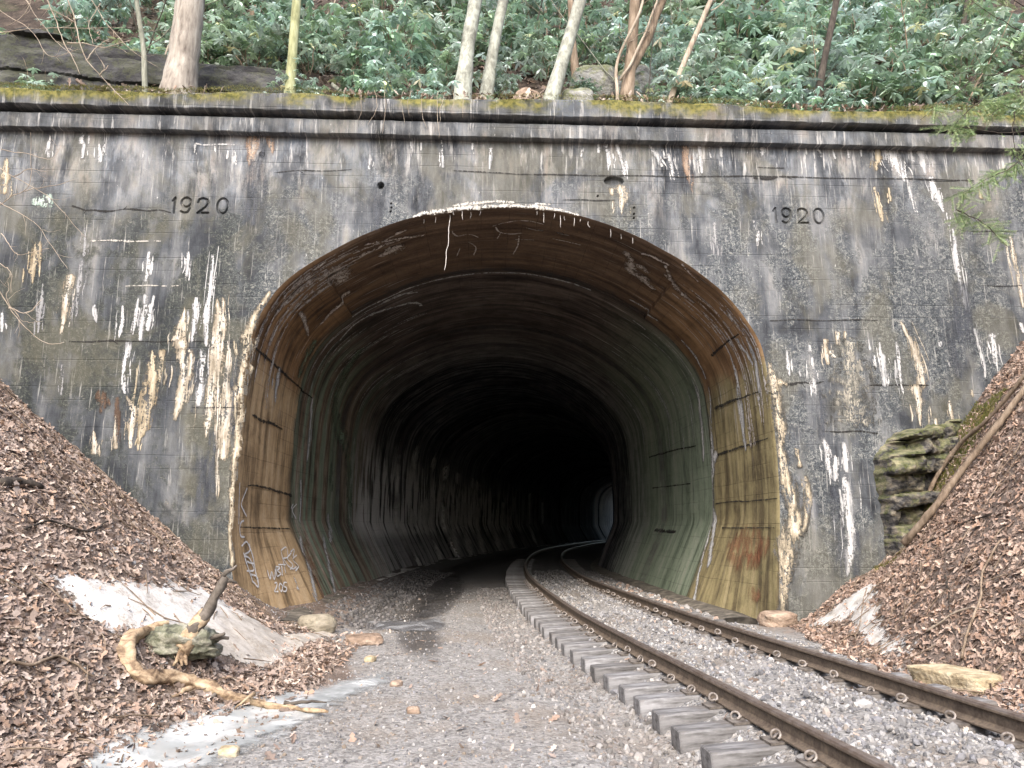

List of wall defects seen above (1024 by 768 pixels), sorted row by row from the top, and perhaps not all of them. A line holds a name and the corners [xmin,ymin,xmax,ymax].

damp [0,158,12,197]
damp [79,132,105,163]
damp [193,143,238,166]
damp [413,199,578,218]
damp [22,241,45,336]
damp [60,227,89,334]
damp [797,148,1003,378]
damp [1004,230,1024,308]